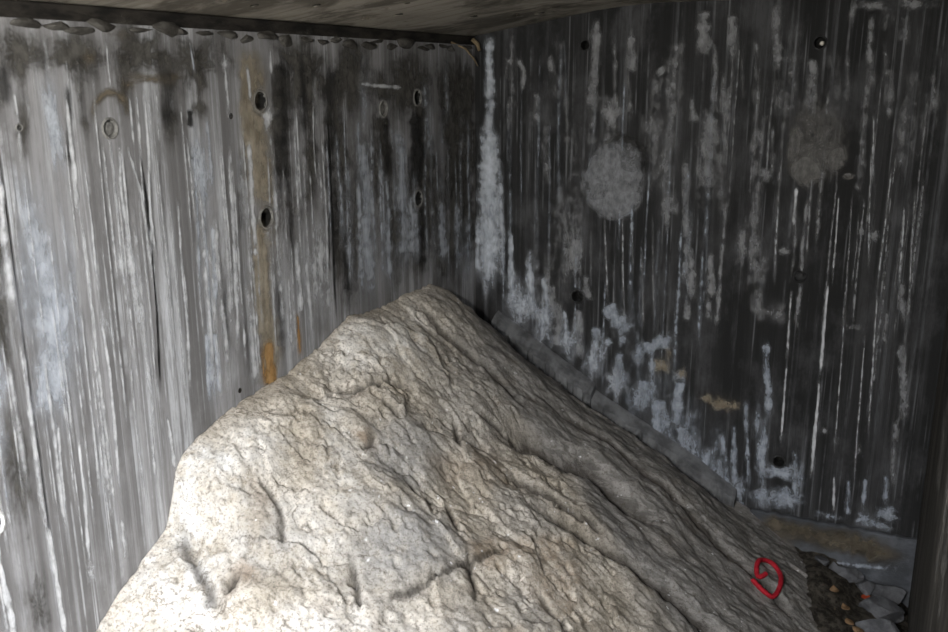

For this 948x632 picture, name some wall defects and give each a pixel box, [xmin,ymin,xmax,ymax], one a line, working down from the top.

corrosion [240,55,273,204]
corrosion [251,225,279,384]
water stain [0,22,631,632]
corrosion [702,395,739,411]
water stain [608,7,909,570]
water stain [843,19,925,403]